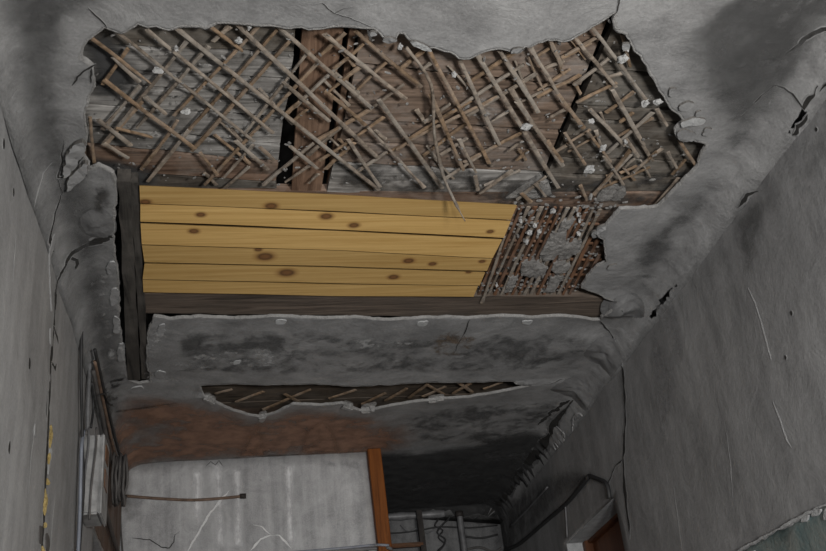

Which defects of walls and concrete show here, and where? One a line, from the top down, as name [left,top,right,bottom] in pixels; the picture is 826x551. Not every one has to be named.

crack [72,63,96,86]
water stain [705,0,821,121]
crack [786,25,826,55]
crack [741,82,826,137]
flaking render [62,12,712,394]
crack [39,141,114,551]
flaking render [199,381,531,423]